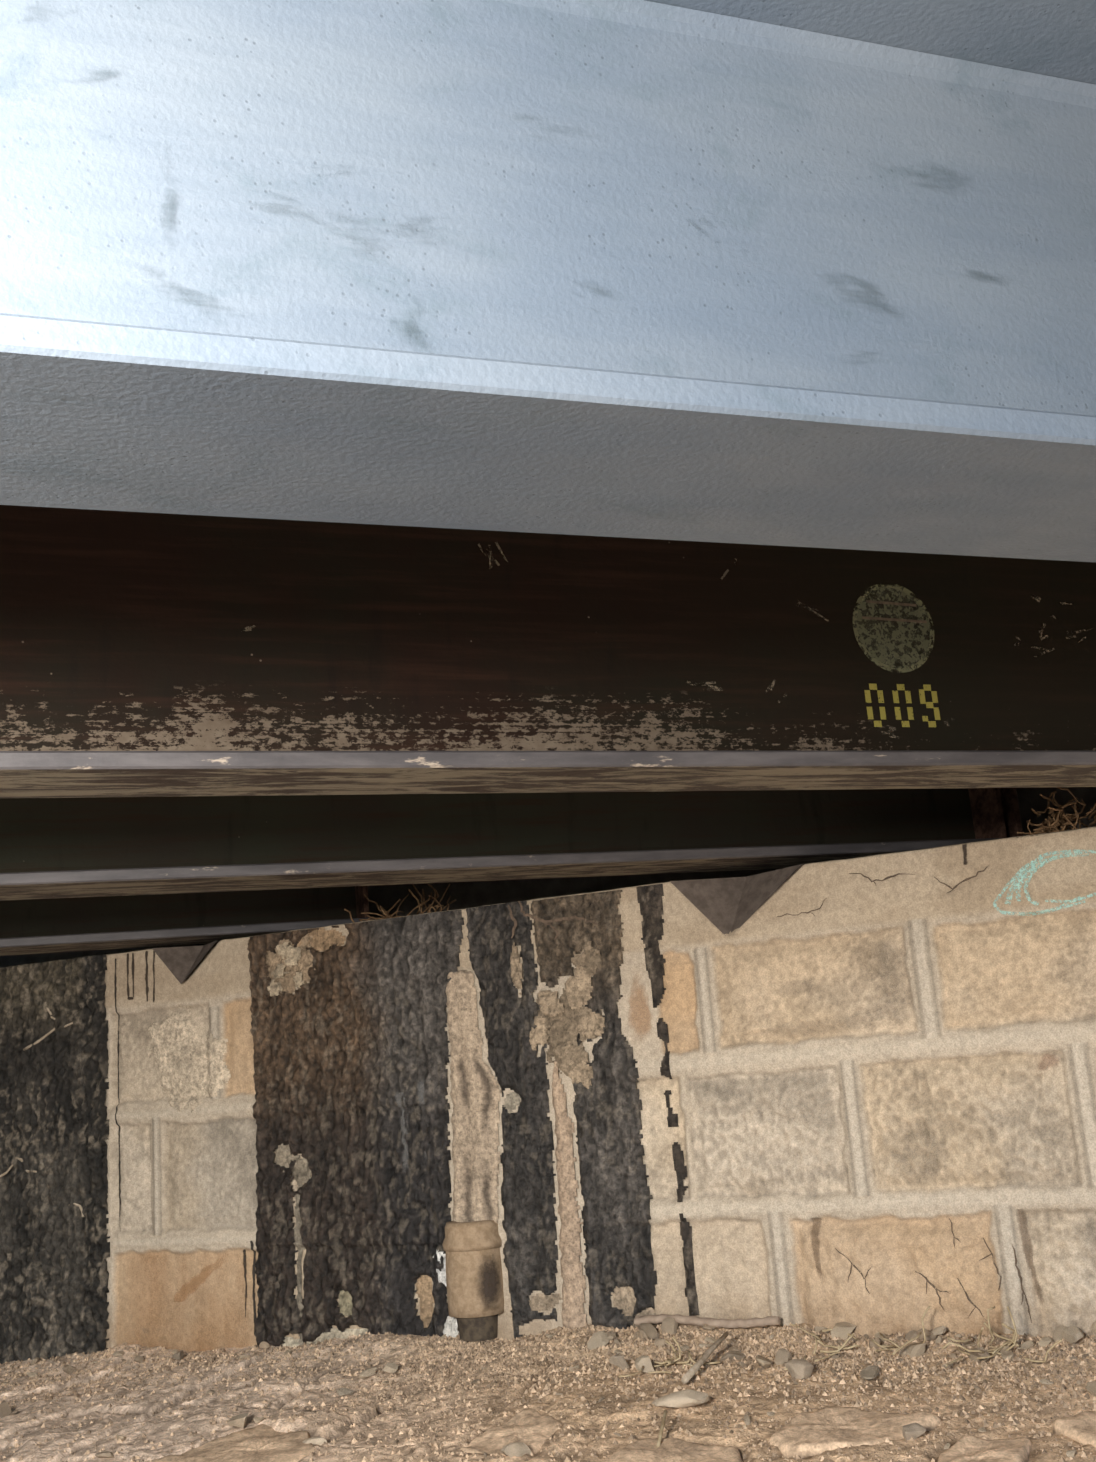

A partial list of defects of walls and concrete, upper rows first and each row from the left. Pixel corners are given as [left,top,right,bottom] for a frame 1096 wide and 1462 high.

crack [835,1248,871,1294]
crack [915,1218,1032,1323]